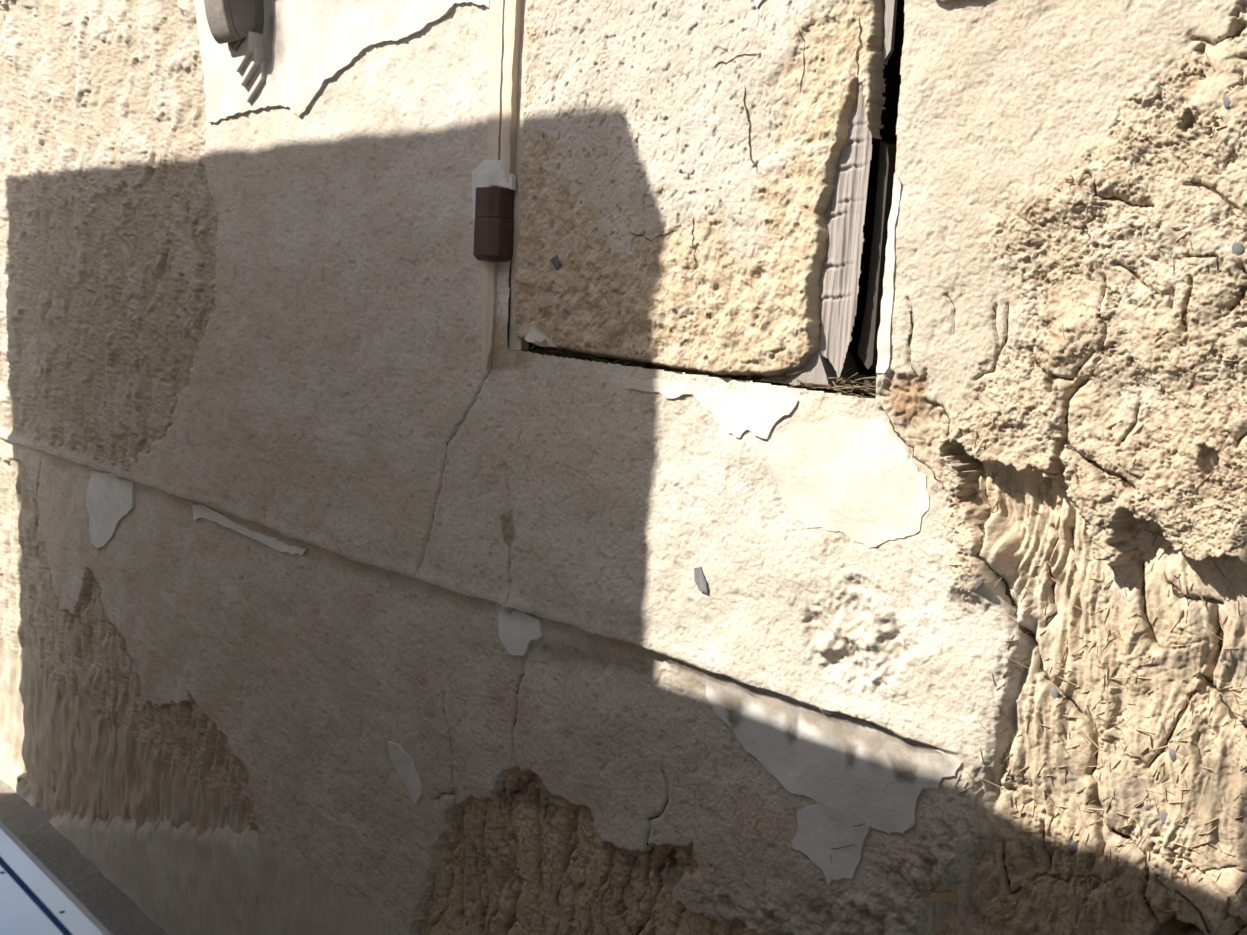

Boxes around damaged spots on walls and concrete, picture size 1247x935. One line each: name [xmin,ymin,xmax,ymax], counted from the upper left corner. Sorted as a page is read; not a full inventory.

crack [714,53,758,174]
crack [855,17,863,77]
spalling [0,0,490,555]
flaking render [622,376,799,439]
spalling [0,458,259,834]
spalling [694,567,710,594]
spalling [703,435,1247,935]
crack [976,487,1077,681]
crack [1075,703,1098,777]
crack [1141,561,1247,766]
spalling [414,767,794,935]
crack [1102,806,1150,907]